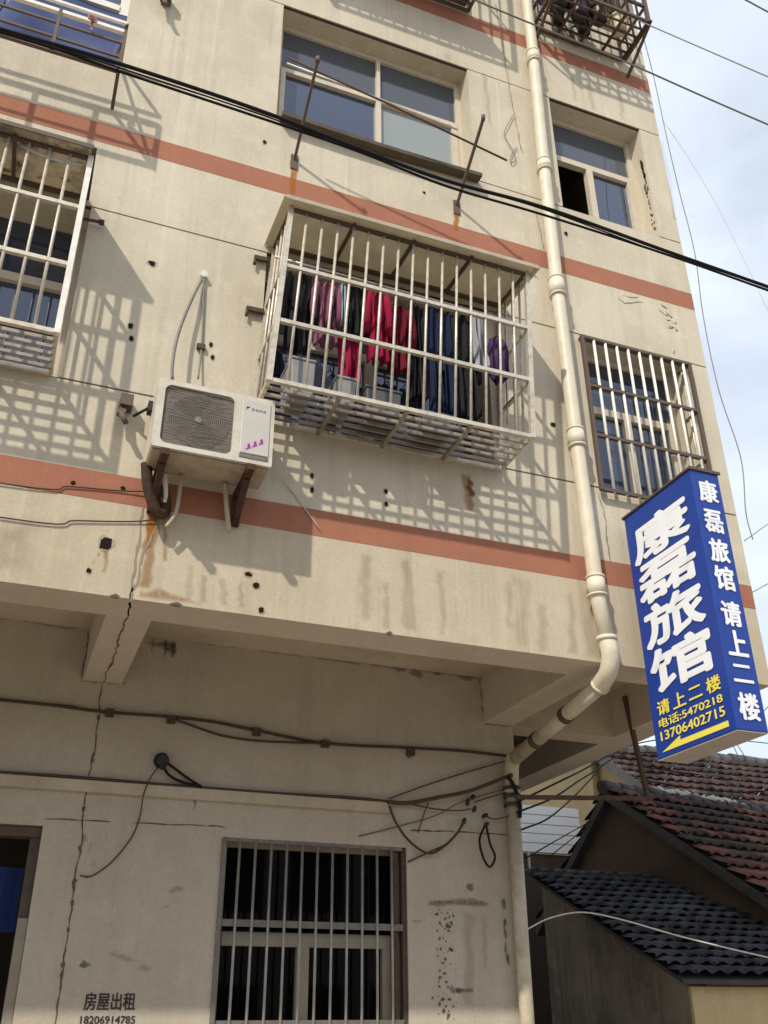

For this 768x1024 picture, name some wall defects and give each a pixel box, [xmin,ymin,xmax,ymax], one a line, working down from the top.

crack [495,4,523,153]
rust [146,513,156,557]
crack [0,506,160,1023]
crack [140,821,225,829]
peeling [432,909,461,1019]